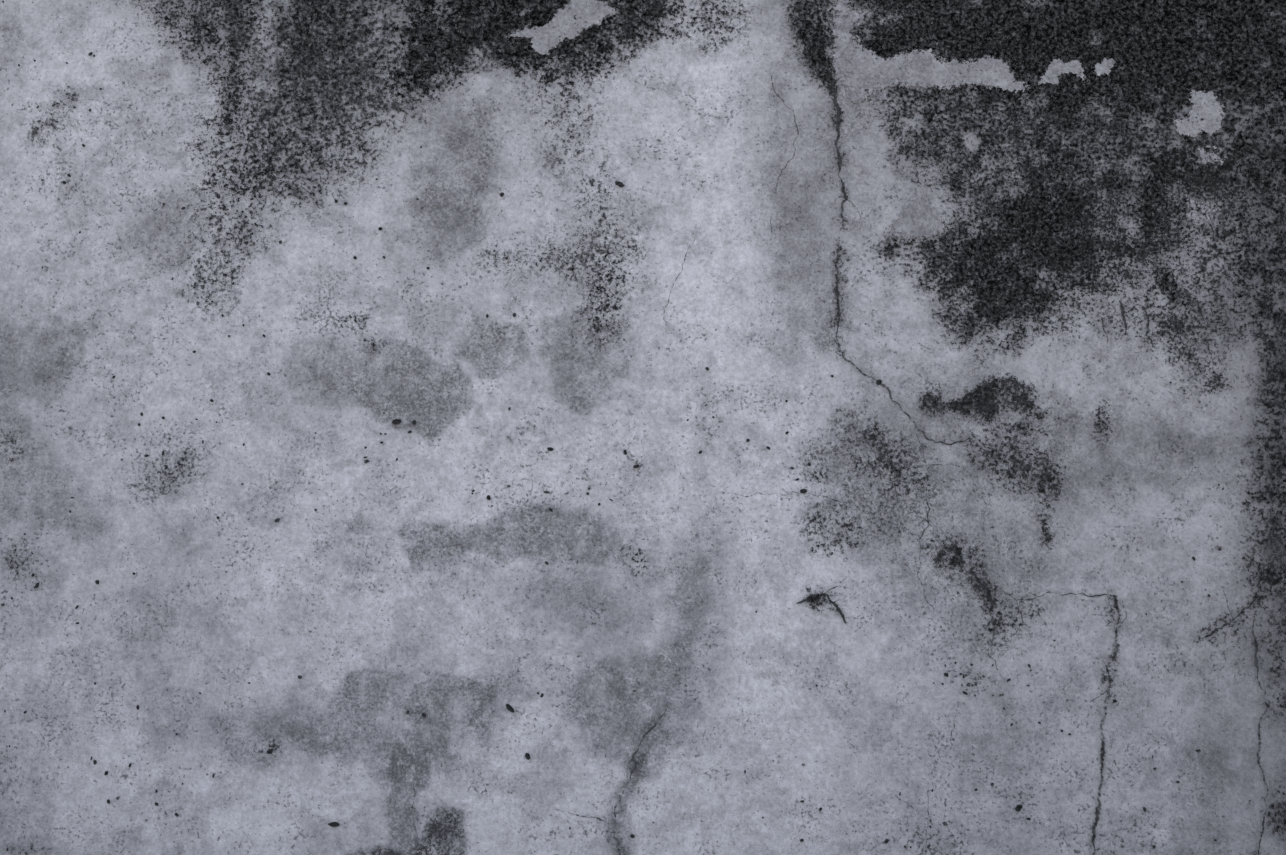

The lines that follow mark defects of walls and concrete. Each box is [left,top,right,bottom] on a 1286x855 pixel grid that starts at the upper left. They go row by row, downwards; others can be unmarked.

leakage [29,86,79,144]
leakage [132,0,752,342]
peeling [508,0,619,55]
peeling [883,195,948,243]
peeling [830,0,1115,103]
leakage [785,0,1286,721]
crack [723,67,1127,855]
leakage [258,672,494,855]
crack [555,709,667,855]
leakage [1265,778,1286,844]